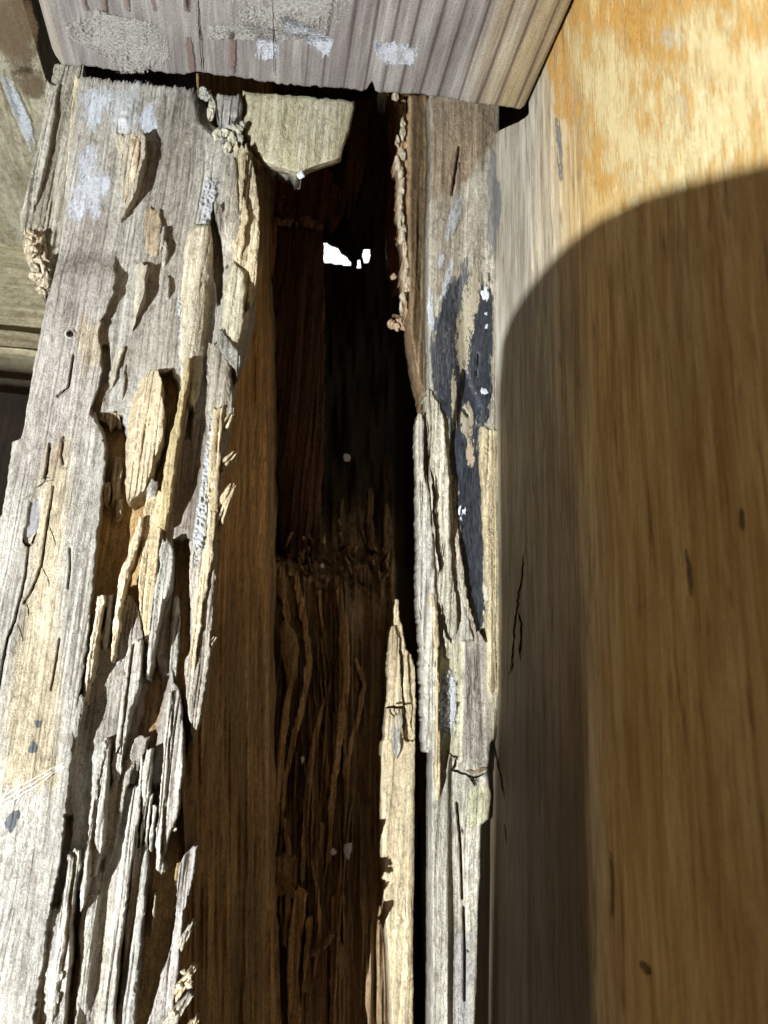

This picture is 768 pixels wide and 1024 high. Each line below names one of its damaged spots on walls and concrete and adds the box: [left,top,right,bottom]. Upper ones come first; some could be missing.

peeling [20,64,87,302]
peeling [112,129,240,413]
peeling [95,347,168,511]
spalling [23,500,40,547]
crack [508,547,526,675]
peeling [147,841,200,1024]